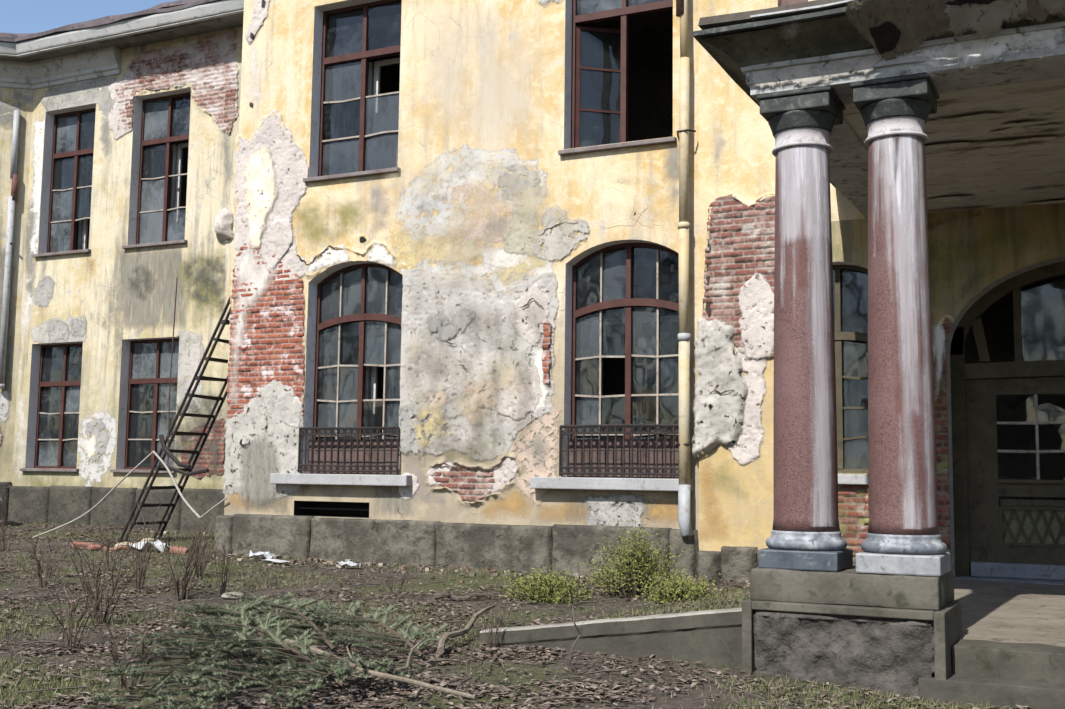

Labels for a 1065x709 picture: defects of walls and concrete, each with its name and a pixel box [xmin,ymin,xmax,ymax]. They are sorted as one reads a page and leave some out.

peeling [0,99,22,126]
leakage [120,249,224,328]
spalling [27,26,589,509]
flaking render [700,191,775,360]
flaking render [0,390,10,453]
flaking render [932,315,954,552]